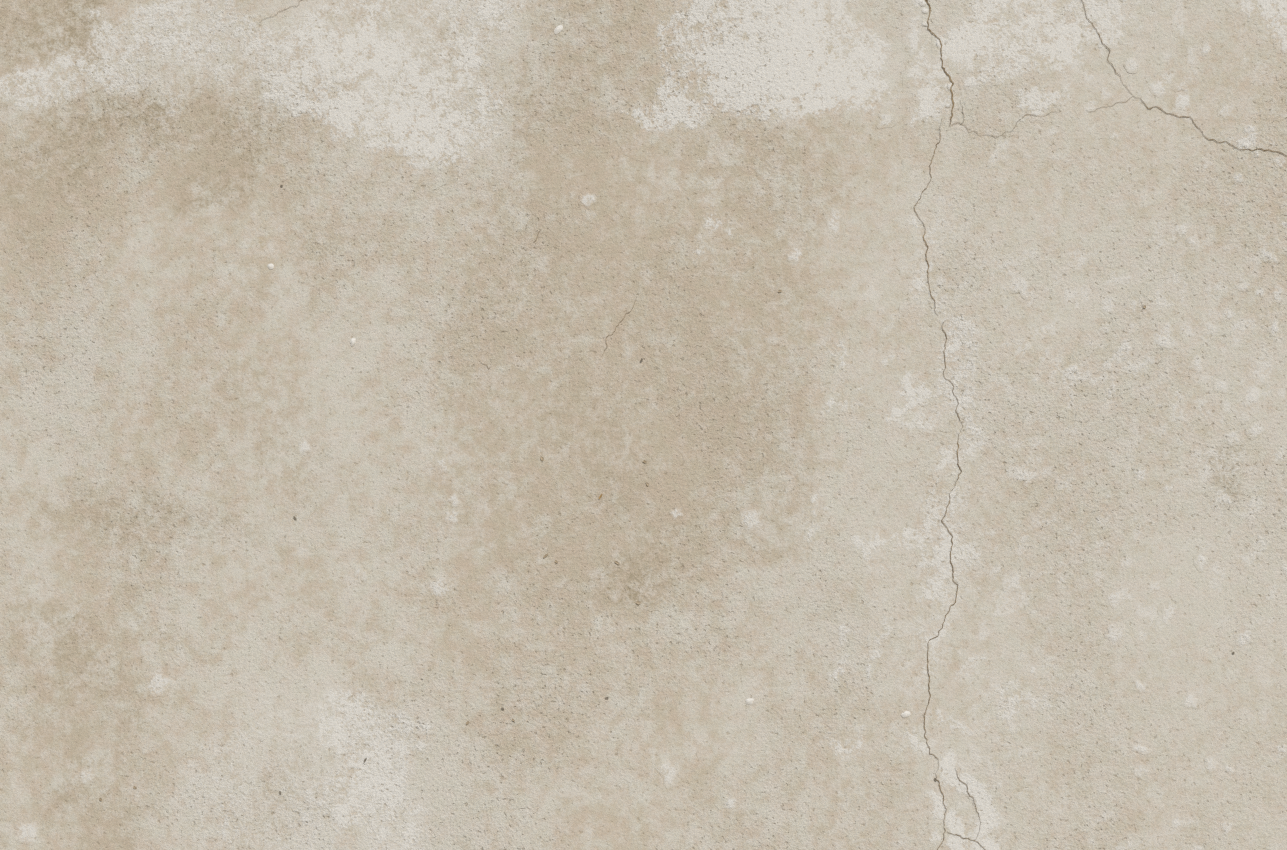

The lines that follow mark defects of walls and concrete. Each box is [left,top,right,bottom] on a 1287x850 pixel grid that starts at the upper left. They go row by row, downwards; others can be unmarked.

crack [914,0,1055,850]
crack [1082,1,1287,158]